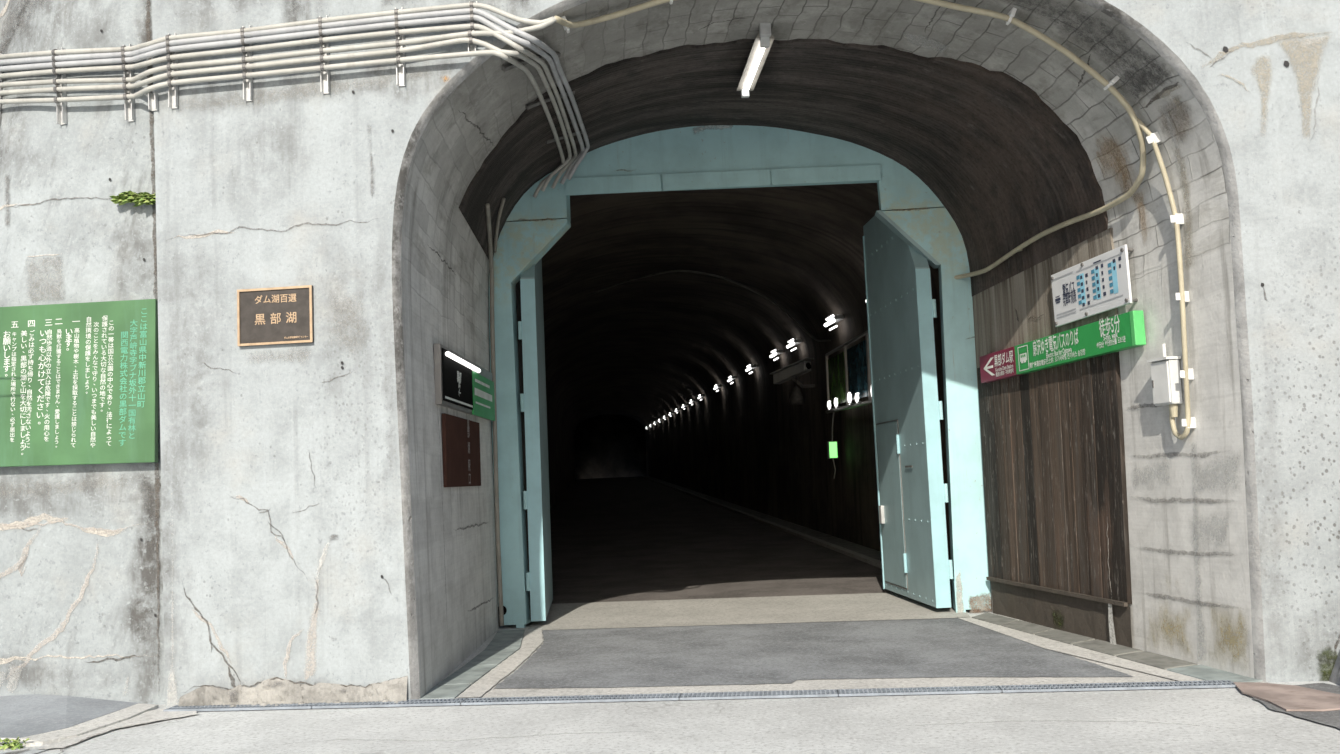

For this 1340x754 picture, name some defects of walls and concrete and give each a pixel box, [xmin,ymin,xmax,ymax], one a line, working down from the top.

crack [9,197,112,207]
crack [146,0,365,299]
crack [0,426,394,754]
spalling [178,676,408,711]